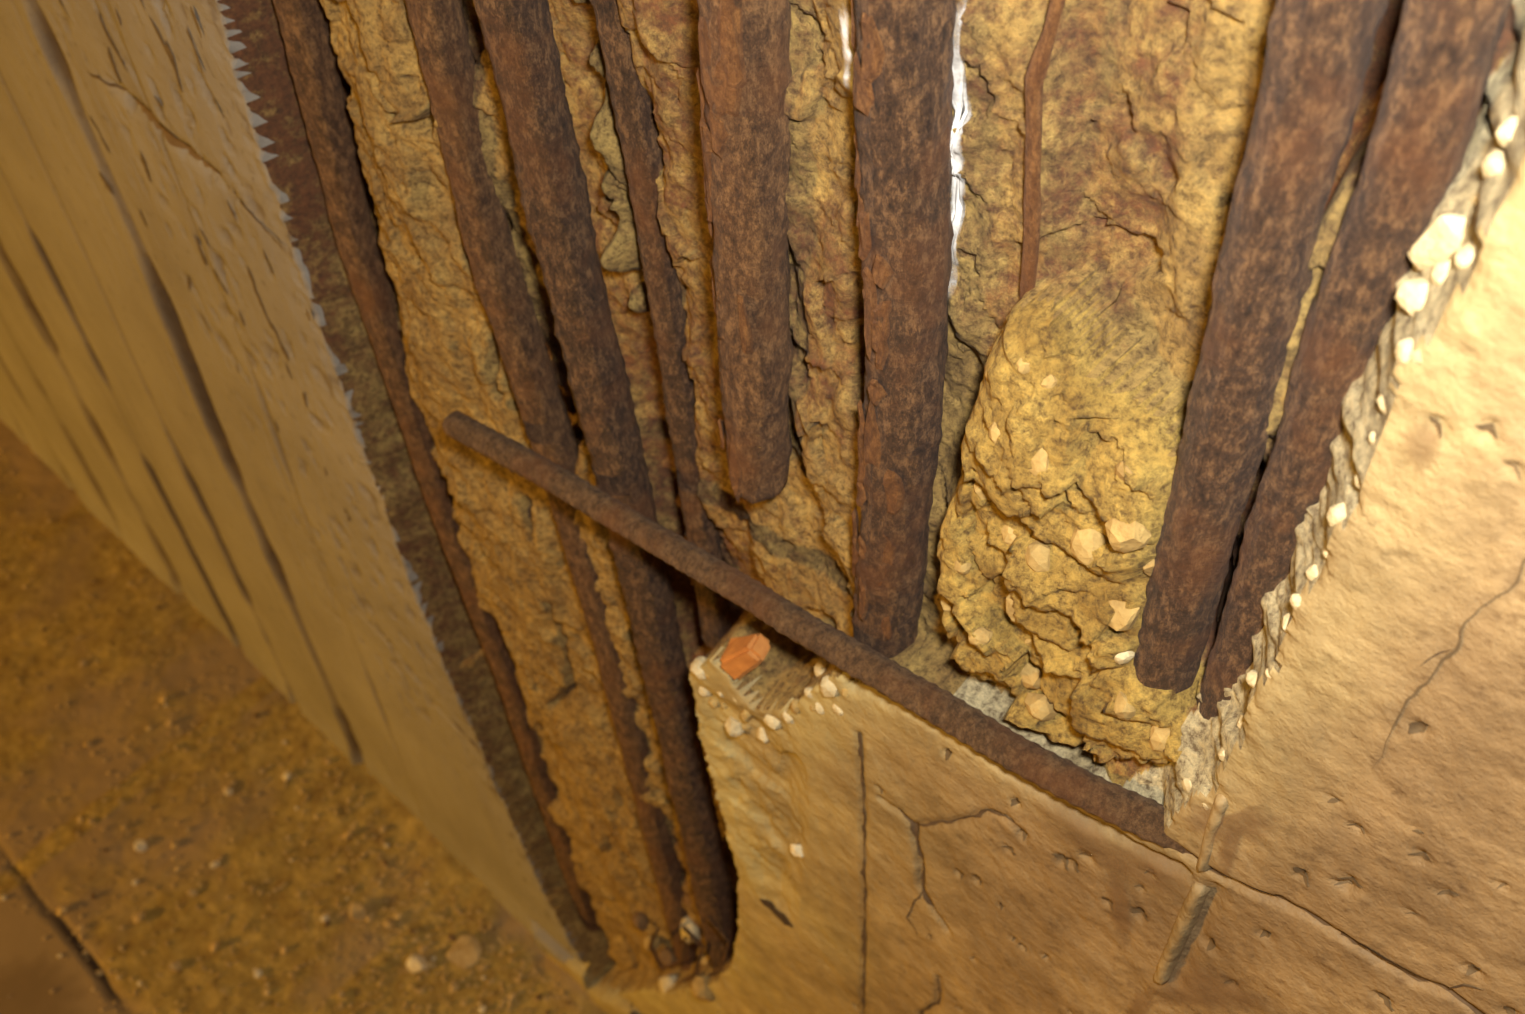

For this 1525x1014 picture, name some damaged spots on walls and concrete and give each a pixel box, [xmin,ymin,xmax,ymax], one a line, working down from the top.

rust [696,0,747,239]
spalling [86,0,734,999]
spalling [548,0,866,637]
rust [718,418,742,503]
spalling [667,564,864,928]
rust [851,0,905,640]
crack [858,732,1020,1014]
spalling [889,0,1525,831]
crack [1183,847,1484,1014]
crack [1372,559,1525,769]